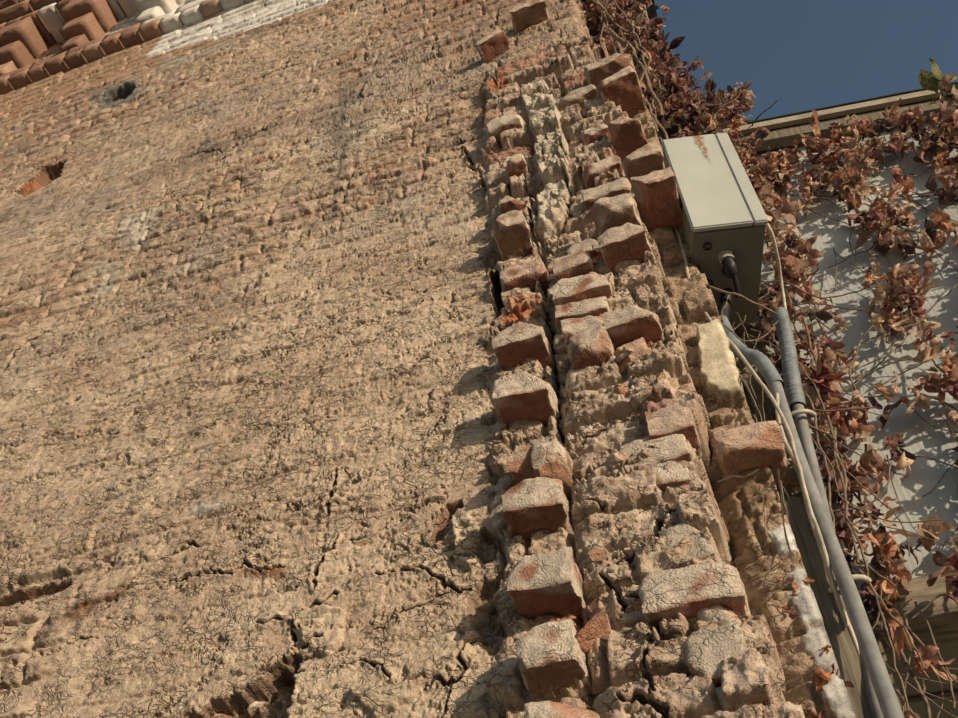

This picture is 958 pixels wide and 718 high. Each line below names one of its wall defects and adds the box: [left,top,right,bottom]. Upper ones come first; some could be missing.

flaking render [486,70,508,91]
spalling [11,161,66,197]
flaking render [488,268,542,327]
spalling [0,578,72,609]
crack [137,472,384,654]
crack [373,560,472,630]
spalling [466,525,508,656]
peeling [769,524,799,554]
spalling [167,651,303,718]
crack [339,659,390,677]
crack [424,640,478,718]